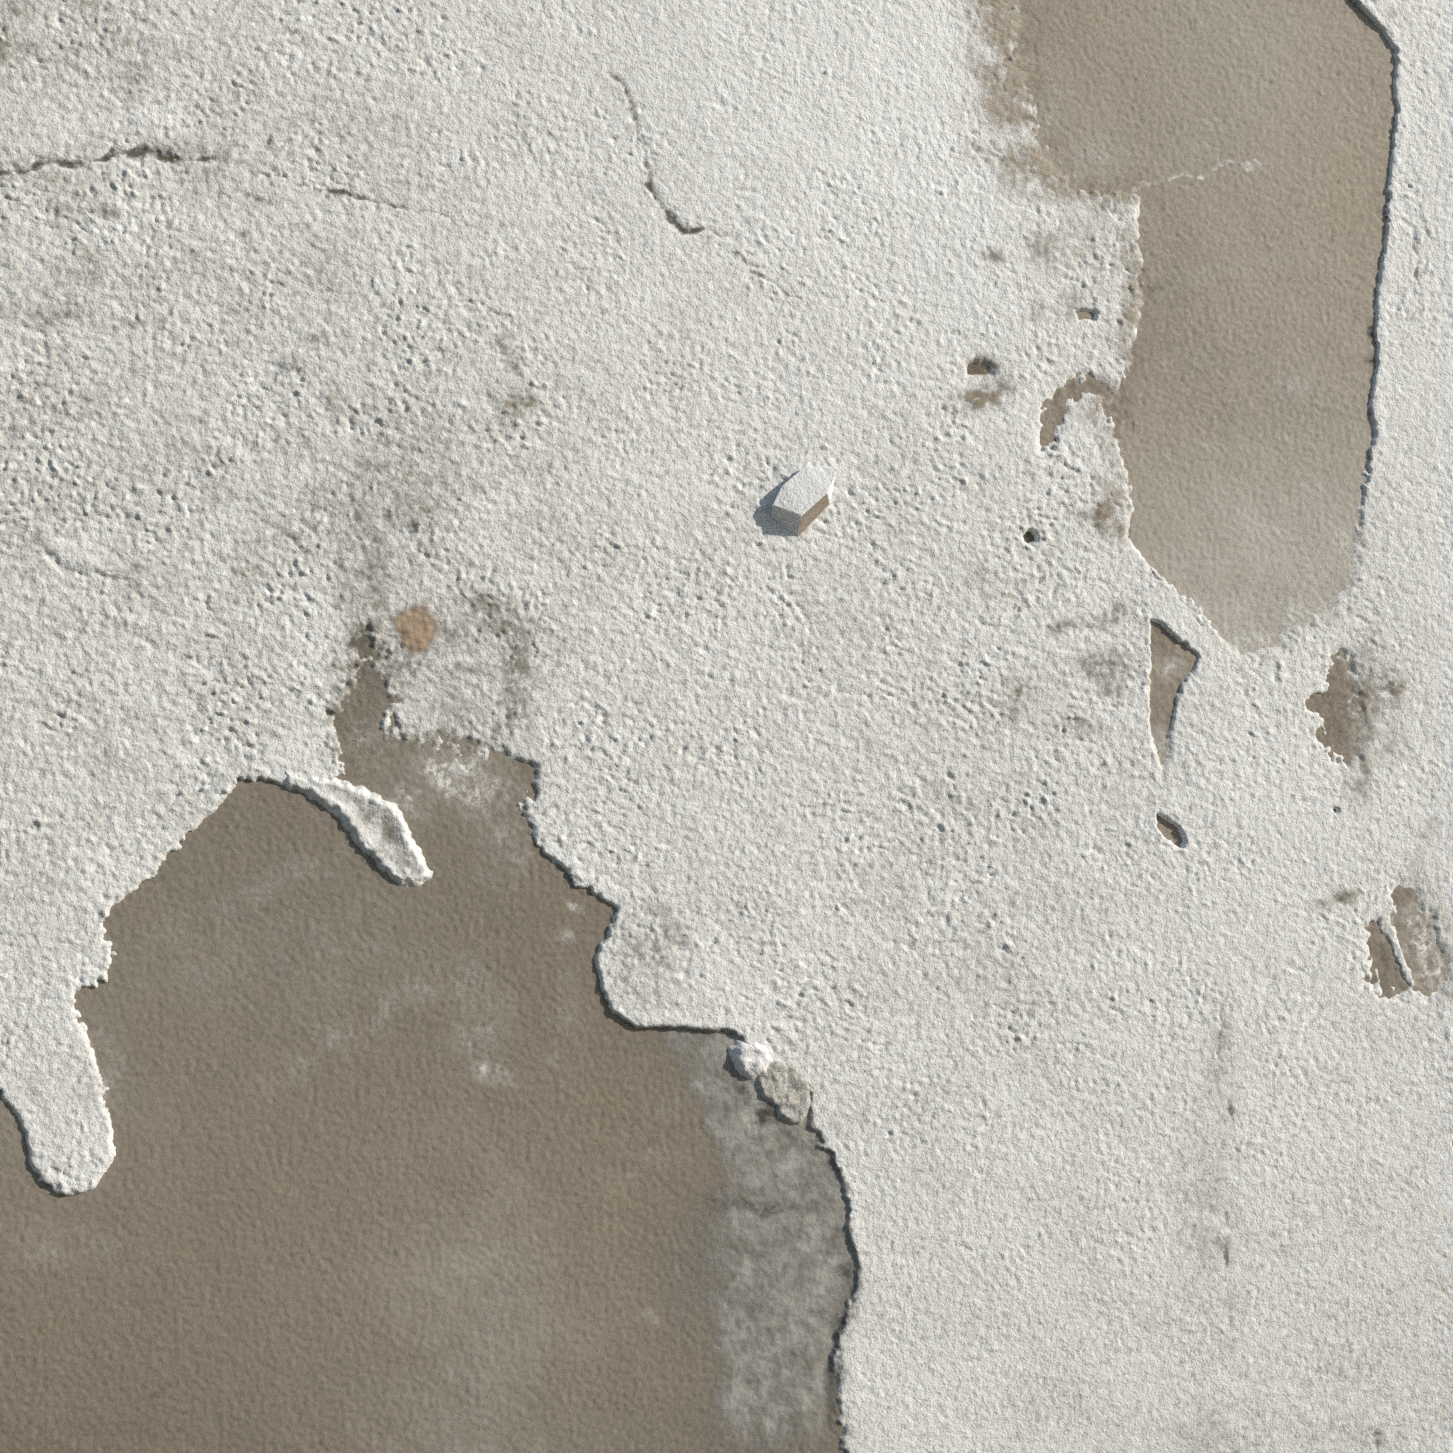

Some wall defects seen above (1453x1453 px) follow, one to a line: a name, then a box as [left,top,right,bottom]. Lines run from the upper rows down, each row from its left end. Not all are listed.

crack [0,146,215,175]
crack [328,189,399,208]
crack [615,76,790,296]
peeling [974,0,1397,655]
spalling [1149,621,1197,765]
spalling [1305,649,1378,769]
spalling [1363,885,1451,999]
peeling [0,625,861,1453]